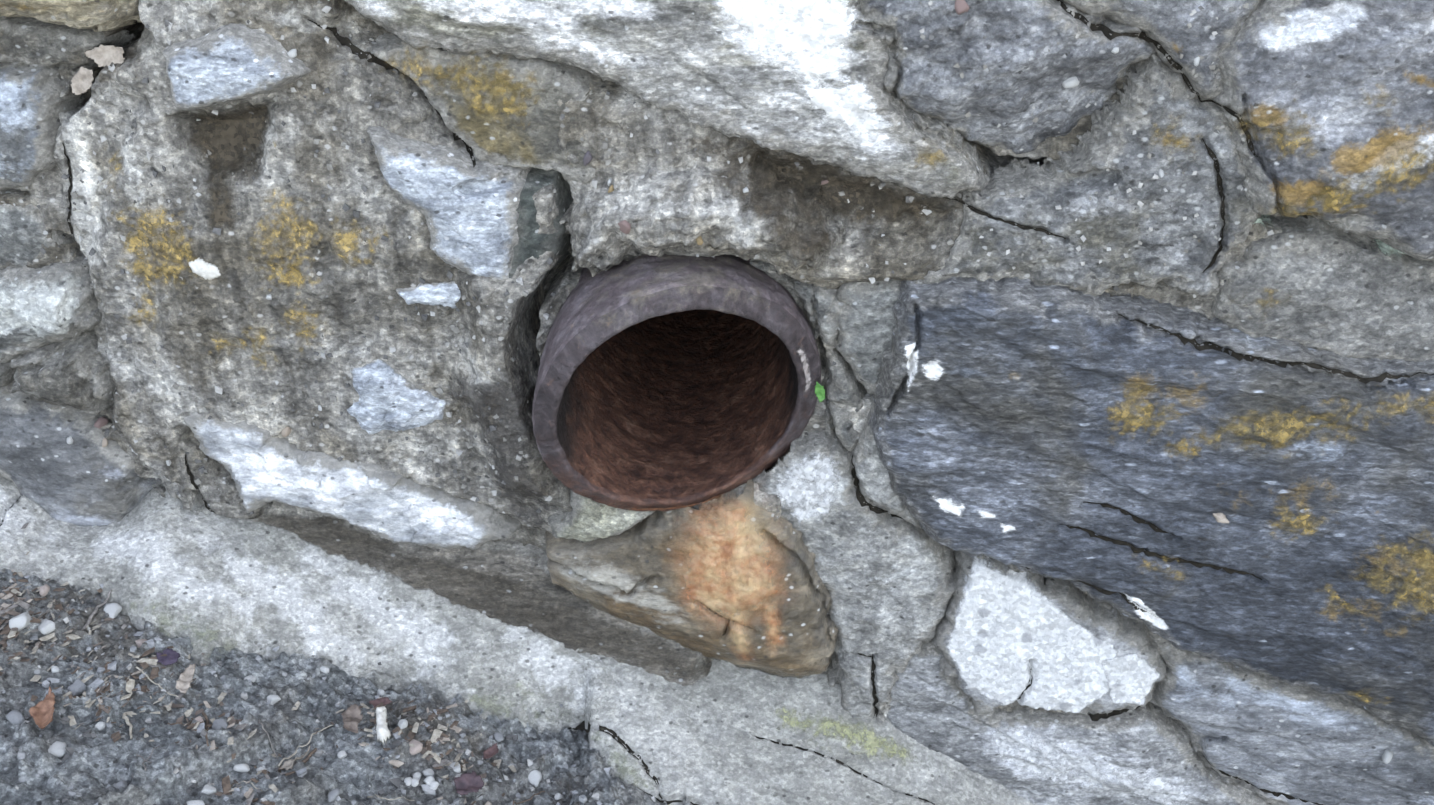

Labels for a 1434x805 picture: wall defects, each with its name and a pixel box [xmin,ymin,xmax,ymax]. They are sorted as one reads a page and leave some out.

crack [1057,0,1258,273]
crack [945,197,1066,239]
crack [1118,314,1434,384]
corrosion [632,494,781,660]
crack [1060,502,1262,580]
crack [568,721,698,805]
crack [756,736,935,805]